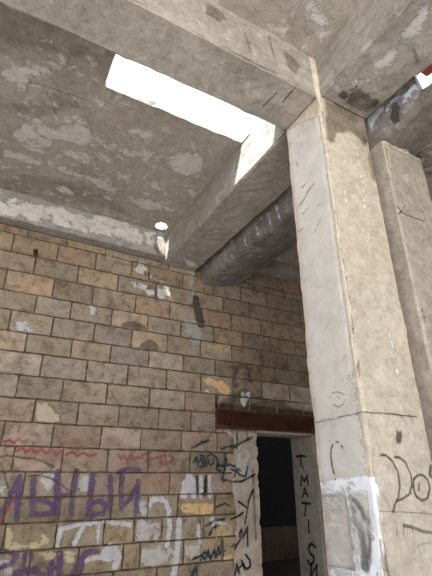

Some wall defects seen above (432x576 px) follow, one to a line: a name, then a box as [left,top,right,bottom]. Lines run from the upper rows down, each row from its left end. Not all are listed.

peeling [12,112,131,203]
water stain [326,5,432,144]
spalling [391,103,400,124]
water stain [183,258,205,346]
corrosion [215,403,313,433]